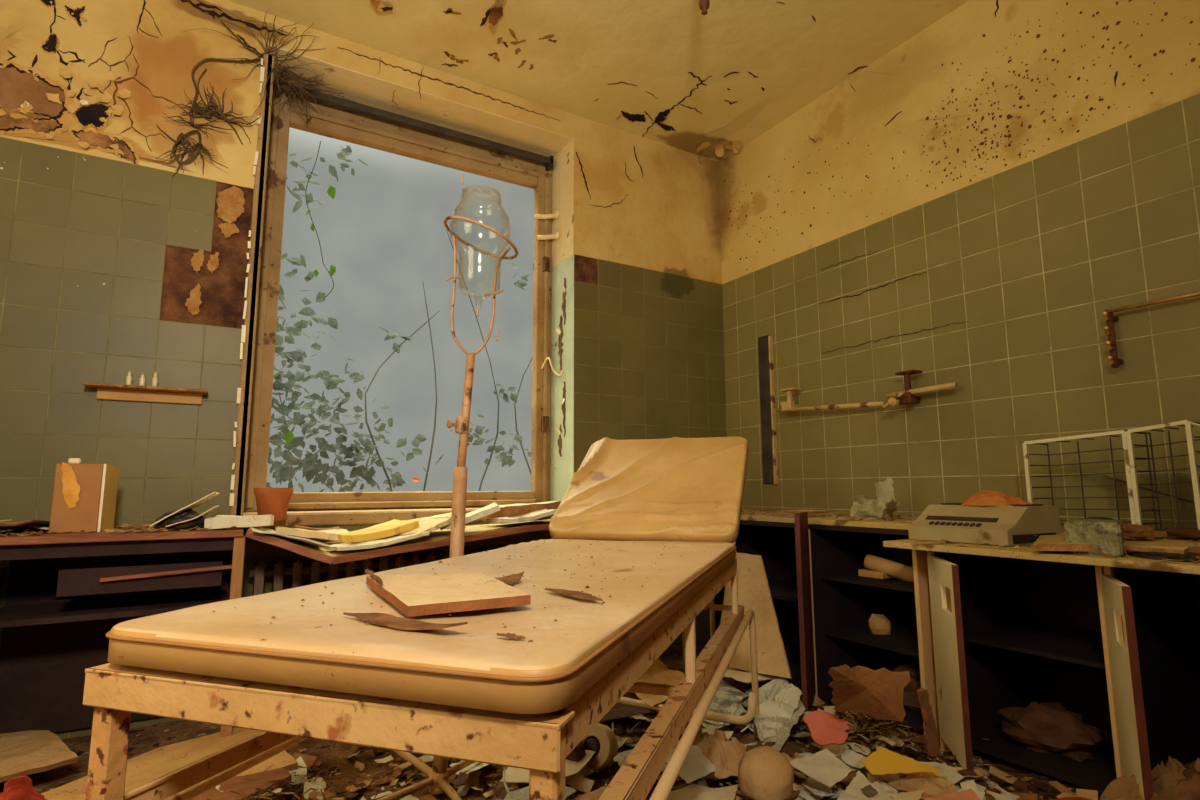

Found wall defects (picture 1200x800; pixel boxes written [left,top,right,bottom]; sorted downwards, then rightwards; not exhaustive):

flaking render [40,33,60,54]
flaking render [0,59,140,165]
crack [7,0,179,151]
crack [181,0,286,53]
peeling [442,51,469,67]
peeling [488,29,557,70]
crack [576,72,711,208]
mould [887,2,1168,190]
peeling [160,151,258,359]